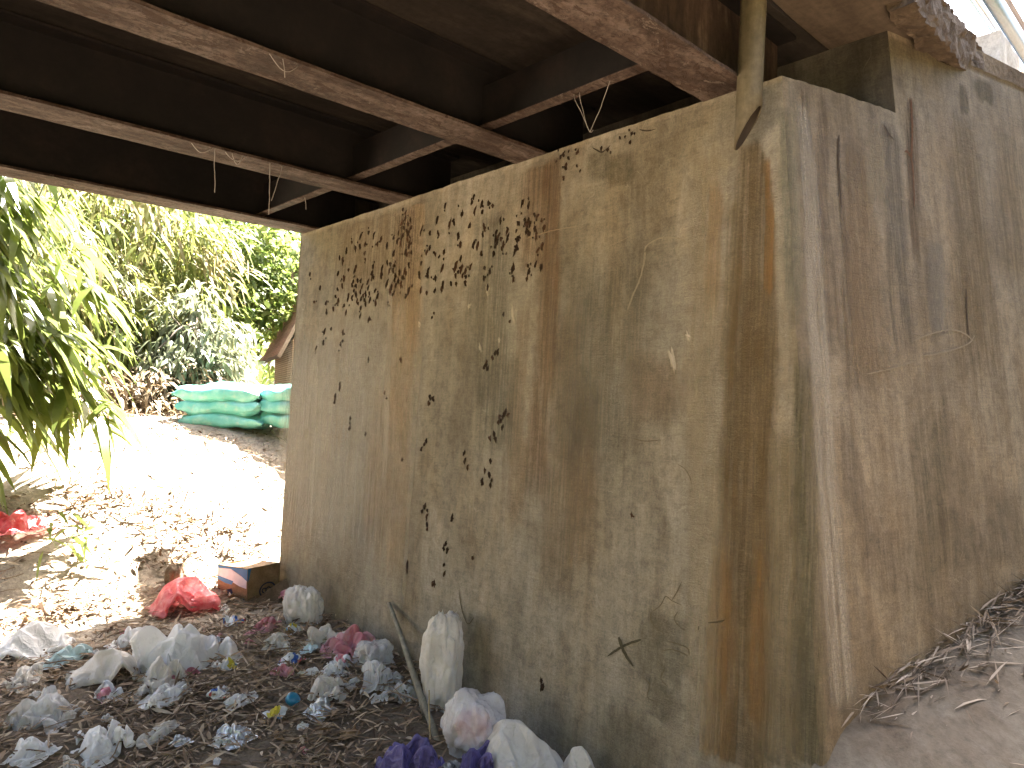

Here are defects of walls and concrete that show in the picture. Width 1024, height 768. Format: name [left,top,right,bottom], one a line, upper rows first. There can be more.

damp [800,112,852,701]